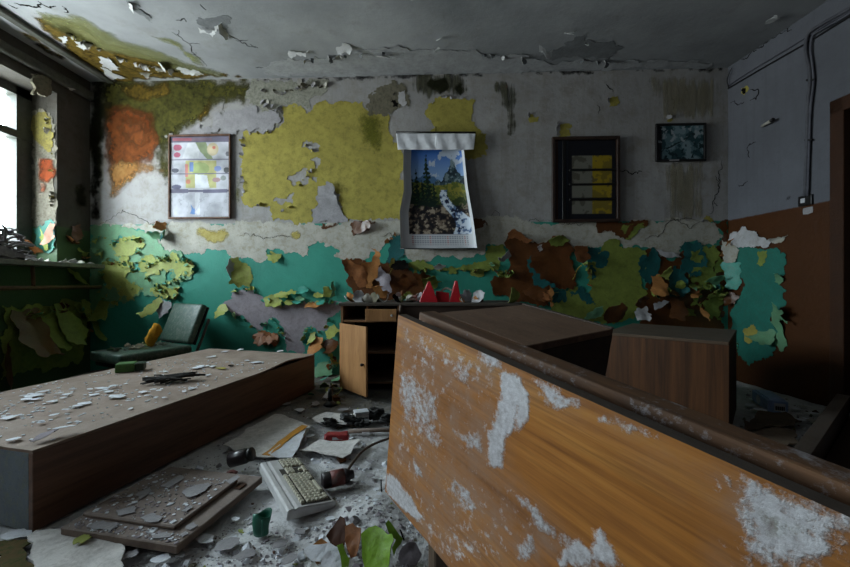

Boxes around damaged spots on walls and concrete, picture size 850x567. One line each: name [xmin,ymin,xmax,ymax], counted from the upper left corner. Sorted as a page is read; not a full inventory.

peeling [127,2,152,23]
peeling [196,15,232,40]
leakage [402,74,465,98]
peeling [0,31,788,390]